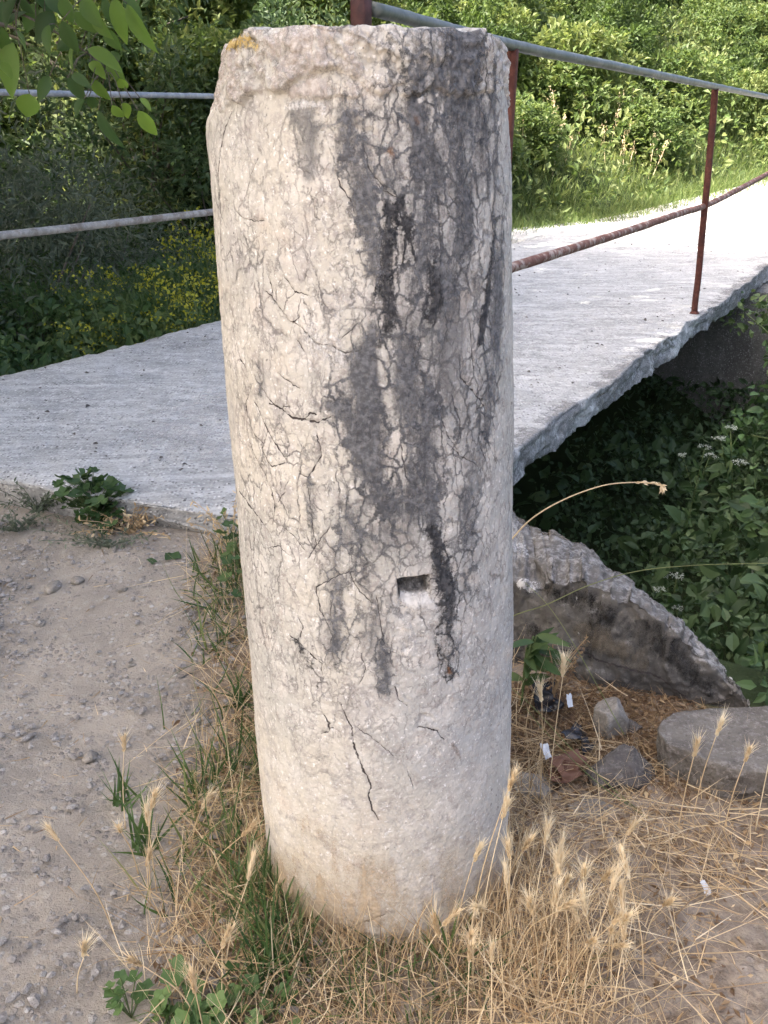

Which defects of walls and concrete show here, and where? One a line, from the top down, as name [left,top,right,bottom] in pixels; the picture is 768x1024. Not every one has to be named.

water stain [285,100,326,110]
crack [218,113,264,242]
crack [364,148,396,197]
crack [266,276,358,363]
water stain [307,27,534,683]
crack [442,323,496,472]
crack [232,324,331,590]
crack [290,571,386,682]
water stain [375,634,395,697]
crack [321,704,413,820]